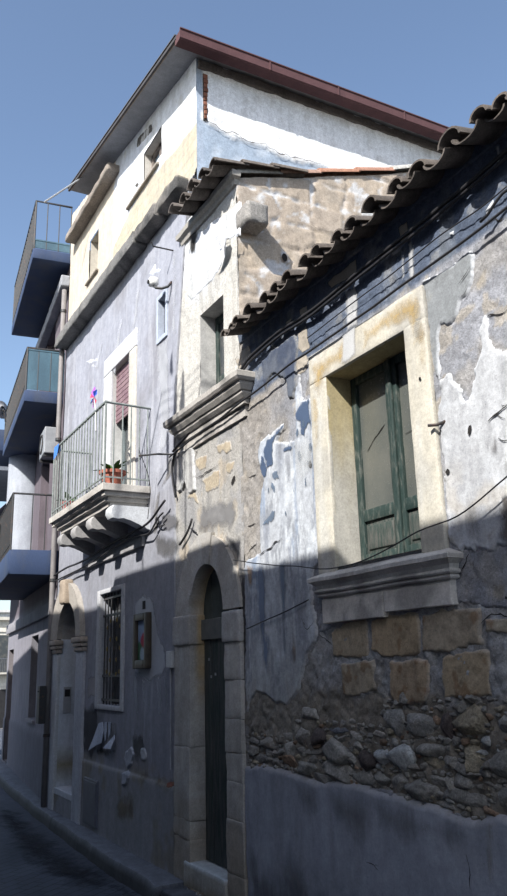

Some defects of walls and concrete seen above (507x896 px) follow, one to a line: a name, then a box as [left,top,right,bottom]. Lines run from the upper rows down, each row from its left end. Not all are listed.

spalling [203,73,321,164]
peeling [188,202,241,301]
peeling [235,345,252,368]
peeling [422,251,507,552]
spalling [244,306,507,821]